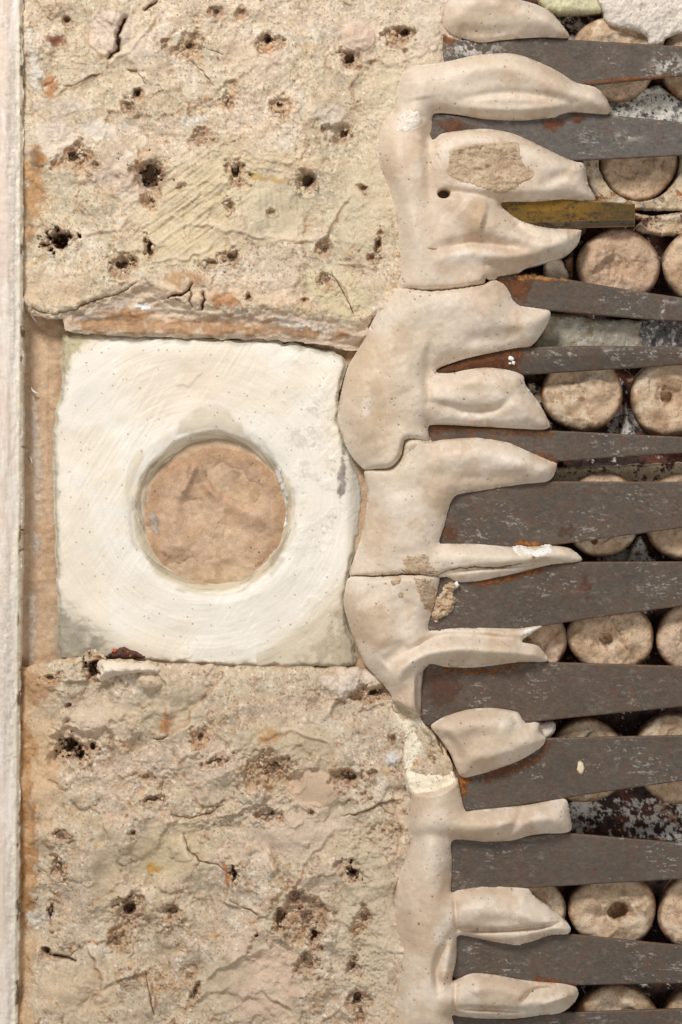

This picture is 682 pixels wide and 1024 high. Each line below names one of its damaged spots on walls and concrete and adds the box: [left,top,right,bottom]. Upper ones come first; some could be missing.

crack [45,1,157,86]
corrosion [439,118,468,132]
spalling [446,140,535,194]
corrosion [436,348,523,372]
spalling [390,554,459,613]
corrosion [458,743,550,794]
crack [174,805,230,873]